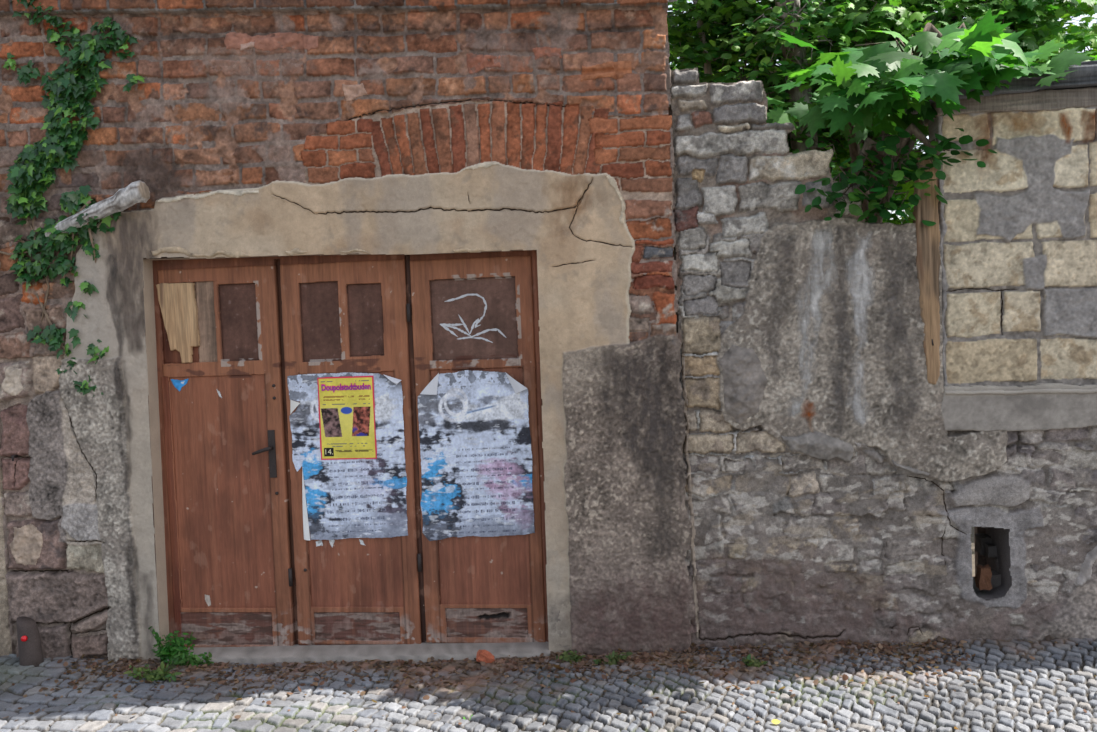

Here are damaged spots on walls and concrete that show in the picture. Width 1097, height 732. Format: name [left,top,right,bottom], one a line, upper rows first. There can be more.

crack [273,181,631,267]
leakage [107,215,154,399]
crack [65,406,97,496]
crack [909,476,967,564]
spalling [974,564,992,590]
flaking render [1075,546,1097,587]
crack [696,609,844,641]